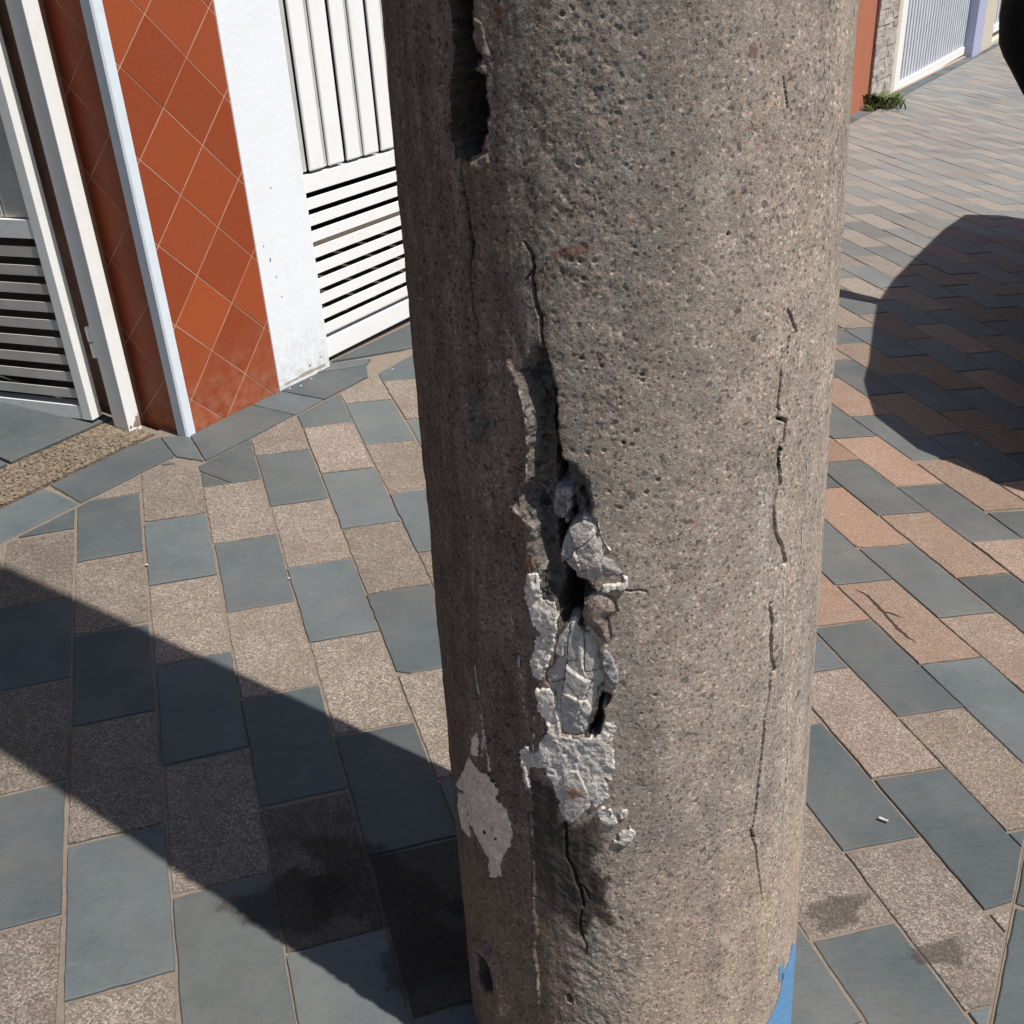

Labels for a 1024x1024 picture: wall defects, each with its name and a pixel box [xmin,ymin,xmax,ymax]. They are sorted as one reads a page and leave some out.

spalling [447,0,490,175]
crack [528,253,544,339]
crack [775,446,783,469]
peeling [519,573,636,846]
peeling [456,729,513,878]